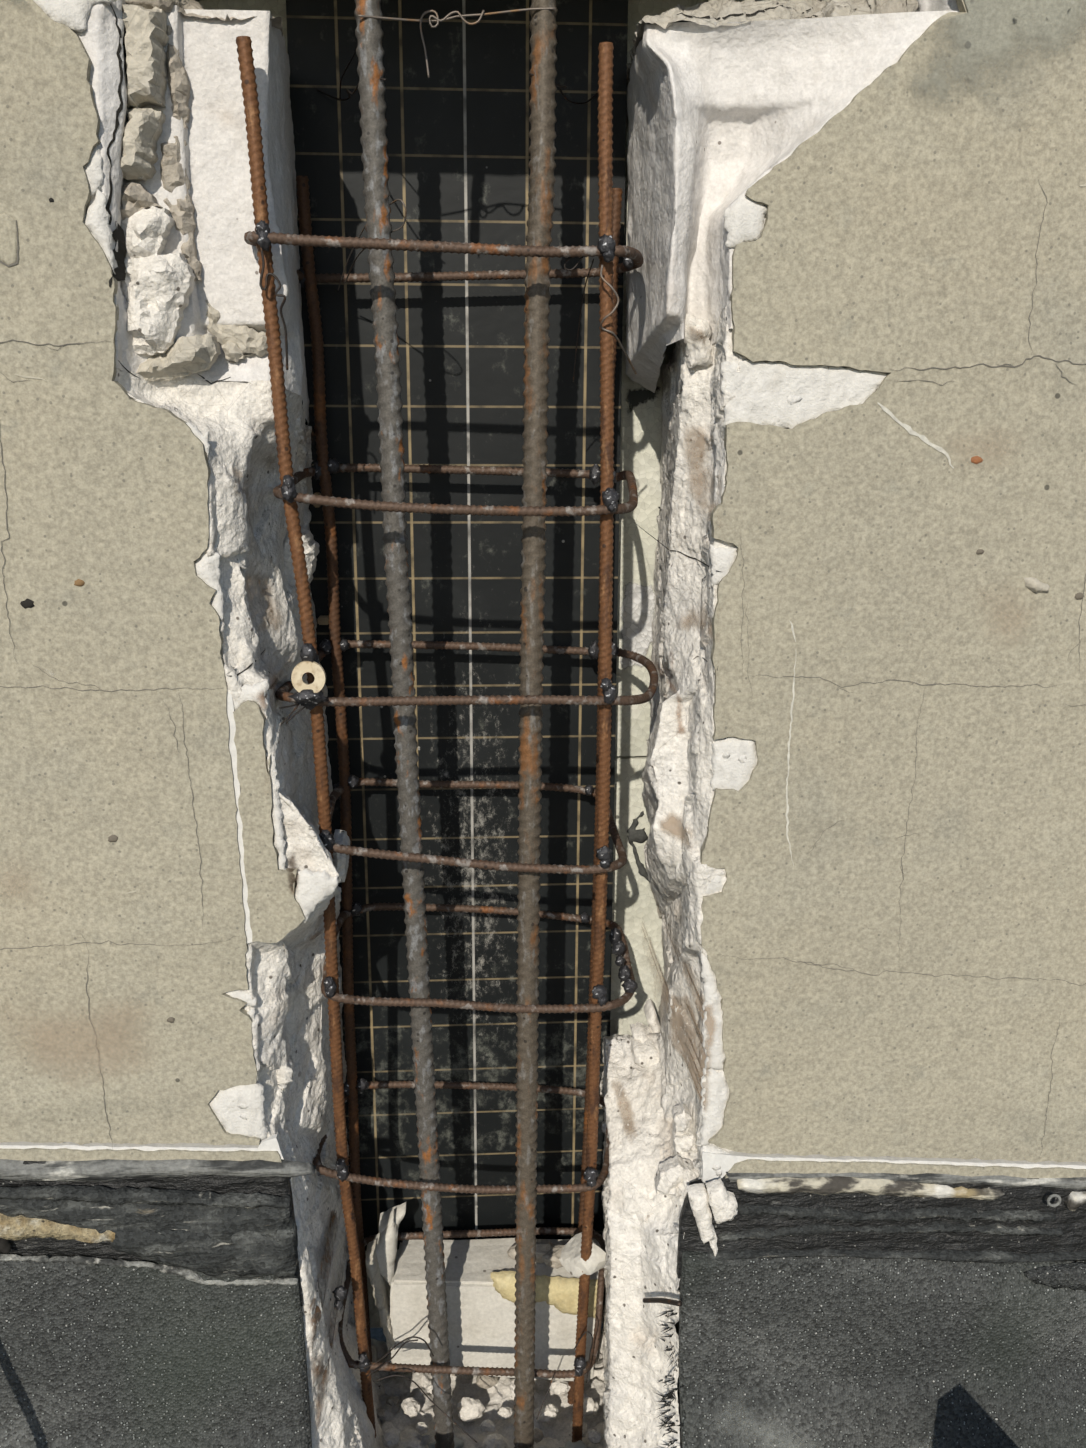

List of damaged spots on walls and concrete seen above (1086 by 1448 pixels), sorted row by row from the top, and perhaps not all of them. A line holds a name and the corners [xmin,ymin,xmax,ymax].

spalling [0,213,19,267]
crack [0,339,141,382]
crack [198,353,254,384]
crack [890,179,1085,386]
crack [0,441,265,1149]
spalling [33,0,385,1448]
spalling [599,11,959,1448]
crack [634,522,1086,1160]